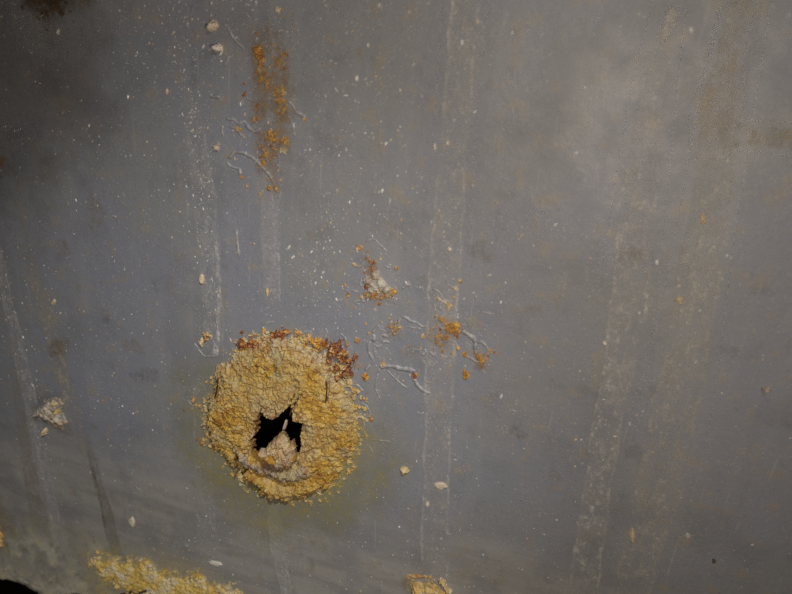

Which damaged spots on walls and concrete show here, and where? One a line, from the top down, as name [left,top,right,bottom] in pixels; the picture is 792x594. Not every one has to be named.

rust [213,24,306,203]
rust [183,238,498,508]
rust [87,548,243,594]